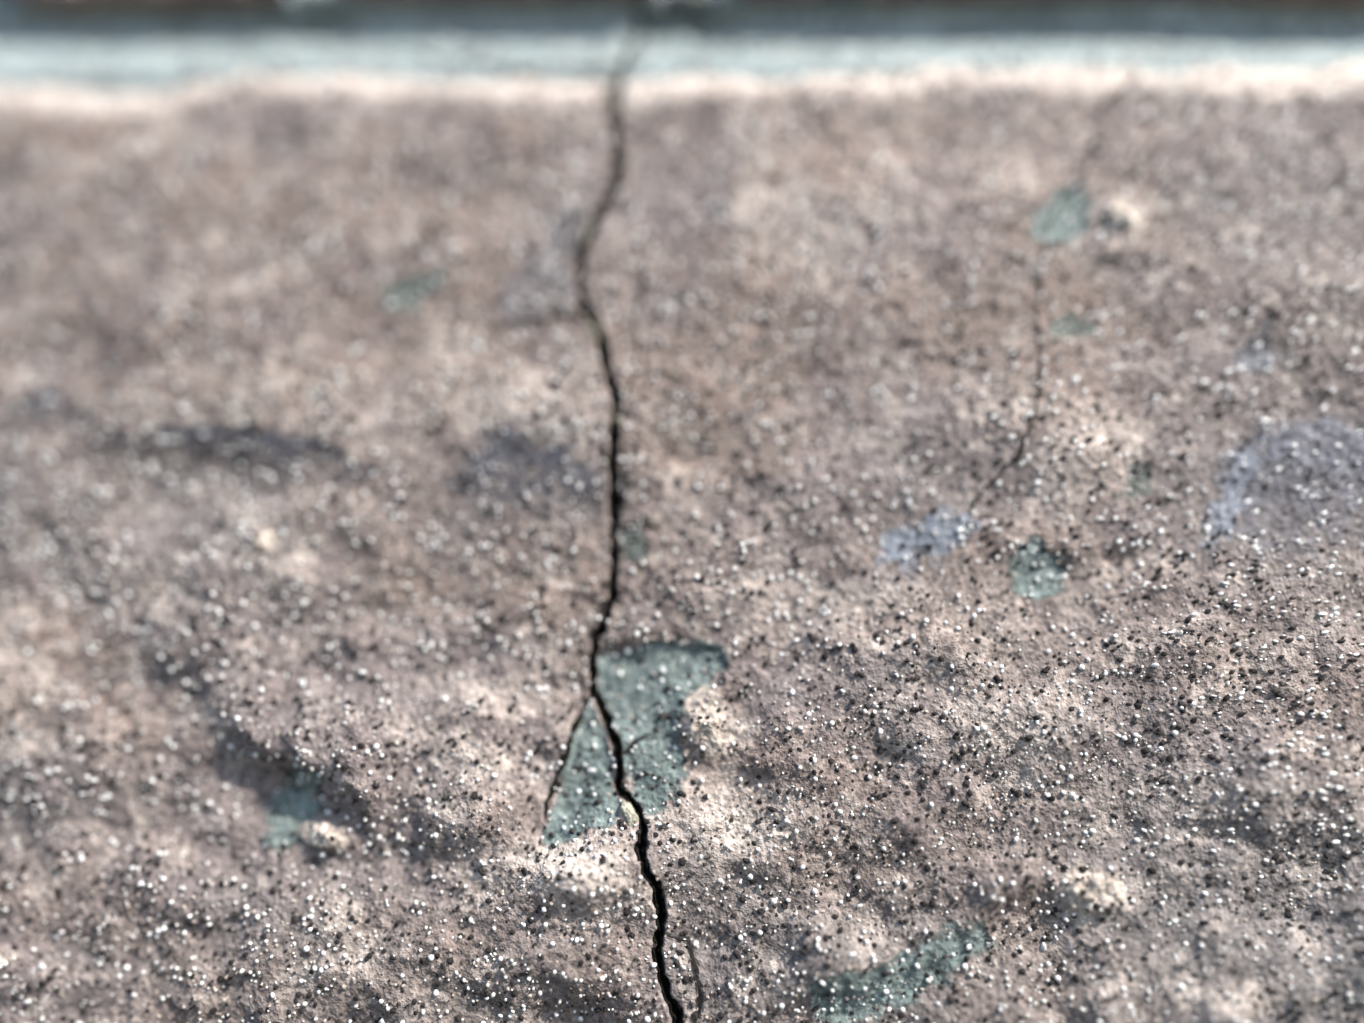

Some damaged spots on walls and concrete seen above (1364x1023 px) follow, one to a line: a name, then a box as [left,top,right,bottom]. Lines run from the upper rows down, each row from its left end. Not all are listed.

crack [412,0,841,1023]
peeling [1010,535,1063,600]
spalling [543,639,728,846]
peeling [811,922,993,1023]